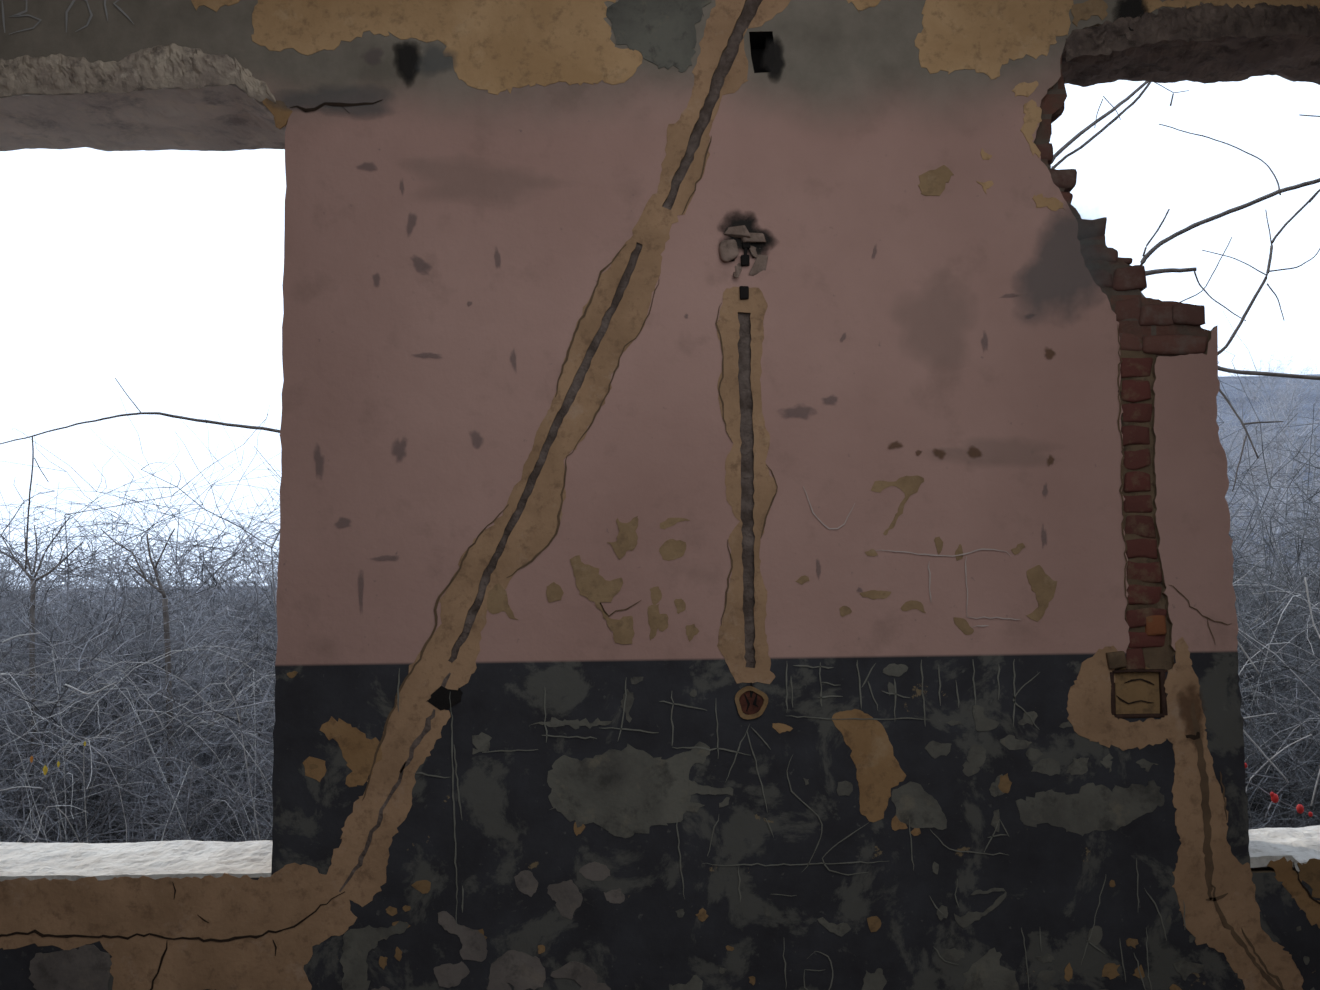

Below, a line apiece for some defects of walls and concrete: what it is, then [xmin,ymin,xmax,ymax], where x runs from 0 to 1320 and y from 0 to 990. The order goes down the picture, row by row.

peeling [191,0,711,95]
peeling [915,0,1320,80]
peeling [918,165,954,196]
flaking render [1012,81,1208,671]
peeling [871,475,924,535]
peeling [883,663,908,695]
peeling [772,723,793,734]
peeling [832,709,947,836]
flaking render [0,685,451,990]
crack [0,882,344,990]
peeling [434,911,611,990]